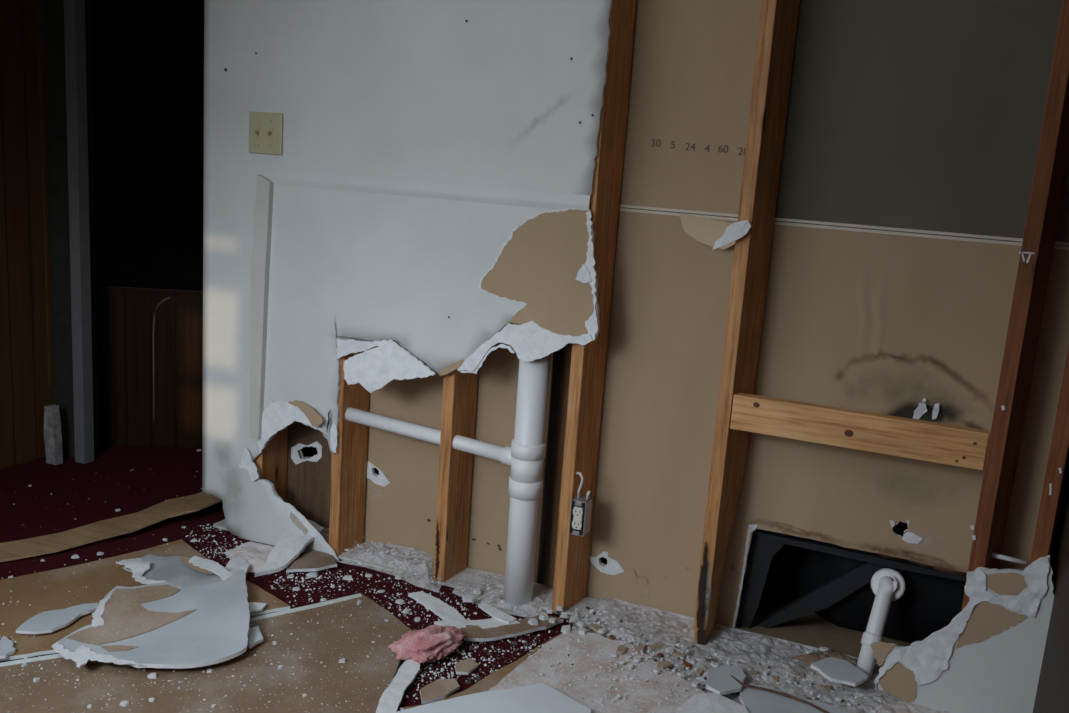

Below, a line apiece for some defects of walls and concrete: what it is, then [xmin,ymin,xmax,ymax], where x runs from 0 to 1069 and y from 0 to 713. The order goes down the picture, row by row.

spalling [780,221,1035,263]
spalling [239,400,338,481]
leakage [889,404,956,421]
spalling [276,496,340,562]